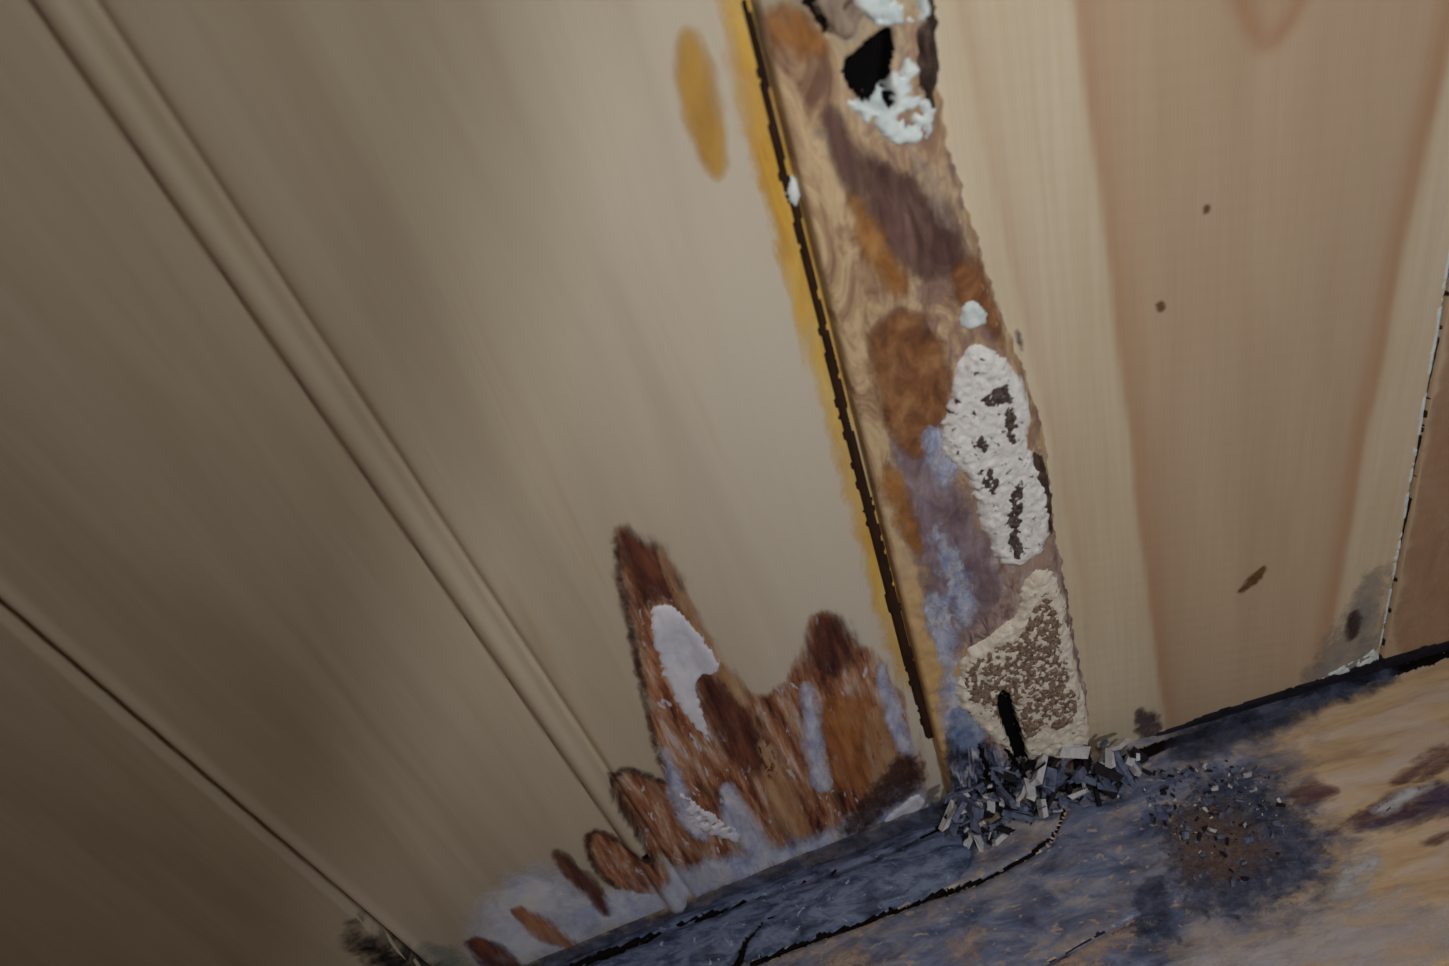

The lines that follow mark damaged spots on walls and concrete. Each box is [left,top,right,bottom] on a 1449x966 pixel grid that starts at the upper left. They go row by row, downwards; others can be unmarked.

spalling [813,0,931,41]
peeling [847,58,937,145]
peeling [960,300,987,330]
crack [741,0,933,739]
leakage [348,0,998,966]
peeling [650,604,721,736]
peeling [679,793,740,843]
peeling [884,794,930,822]
leakage [758,709,1449,966]